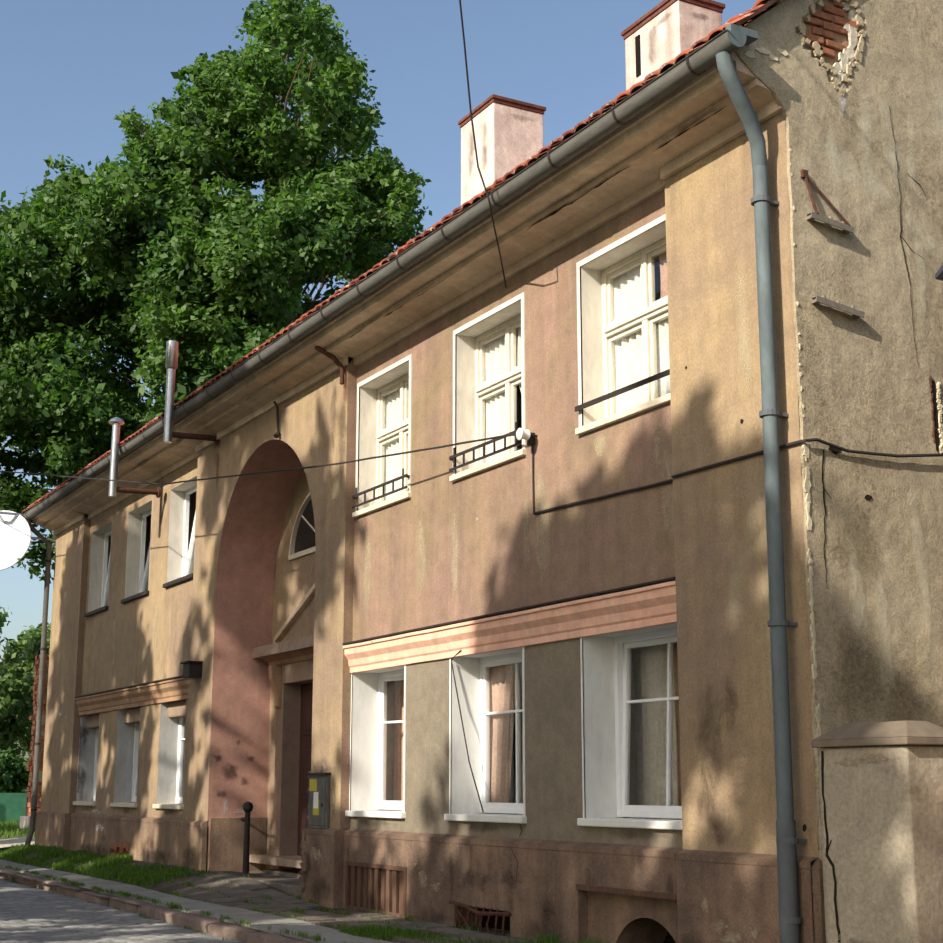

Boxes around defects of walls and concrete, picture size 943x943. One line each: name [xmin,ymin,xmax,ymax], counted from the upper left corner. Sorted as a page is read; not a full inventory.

spalling [798,0,866,115]
crack [651,106,726,153]
crack [531,165,632,227]
crack [889,106,927,366]
spalling [929,375,943,453]
spalling [802,442,812,531]
spalling [807,549,818,679]
crack [821,751,841,942]